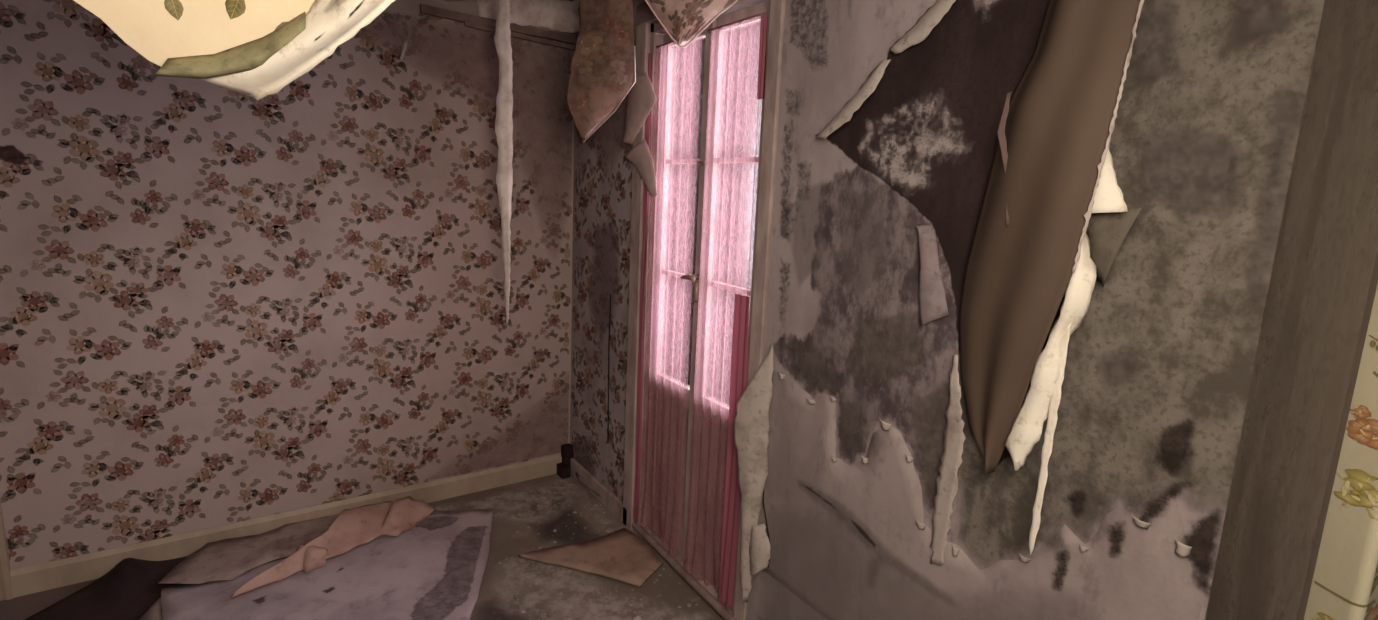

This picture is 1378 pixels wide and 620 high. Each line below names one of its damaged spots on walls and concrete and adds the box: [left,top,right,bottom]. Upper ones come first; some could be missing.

peeling [791,0,828,68]
damp [363,23,570,221]
damp [590,94,628,158]
peeling [781,90,810,241]
damp [769,0,1378,620]